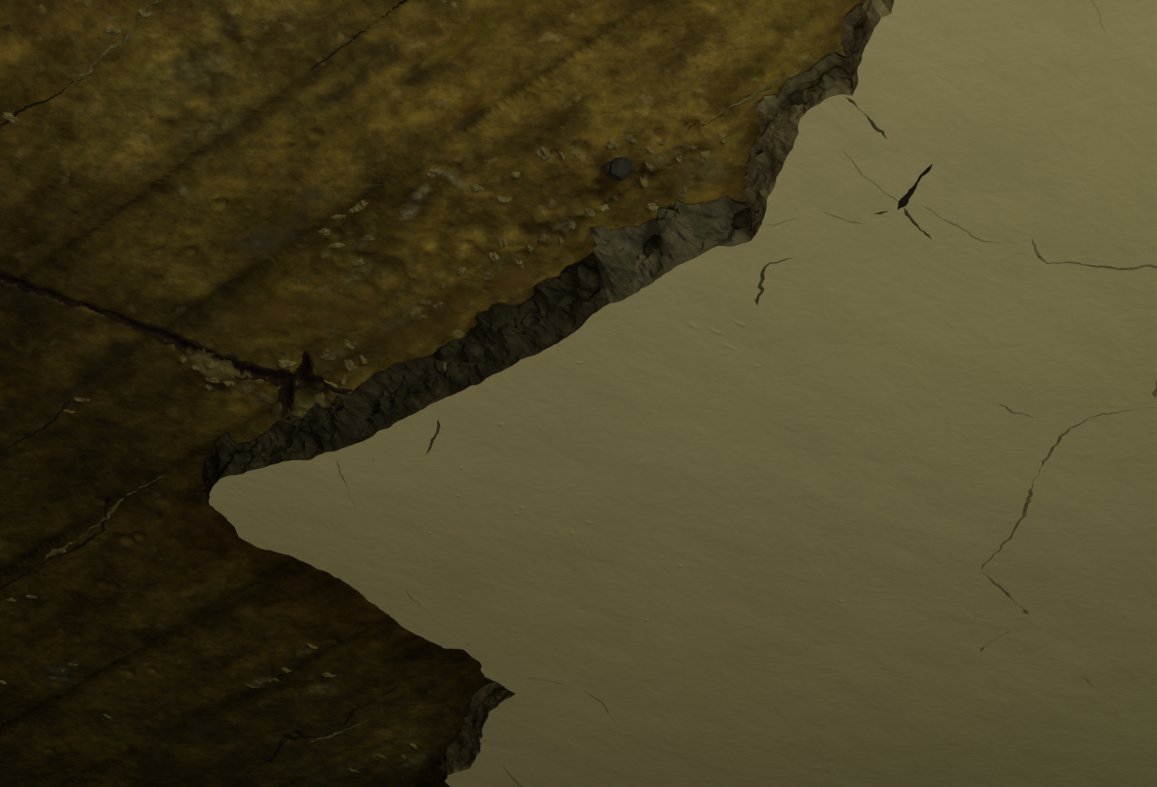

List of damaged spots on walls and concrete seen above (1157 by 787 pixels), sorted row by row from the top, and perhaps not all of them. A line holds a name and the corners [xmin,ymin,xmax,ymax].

crack [0,0,174,126]
crack [846,97,887,139]
crack [768,150,999,242]
spalling [201,0,894,505]
crack [755,258,791,306]
crack [1032,239,1157,270]
crack [0,270,359,420]
spalling [179,348,269,402]
crack [425,419,440,455]
crack [980,381,1157,651]
spalling [438,661,516,780]